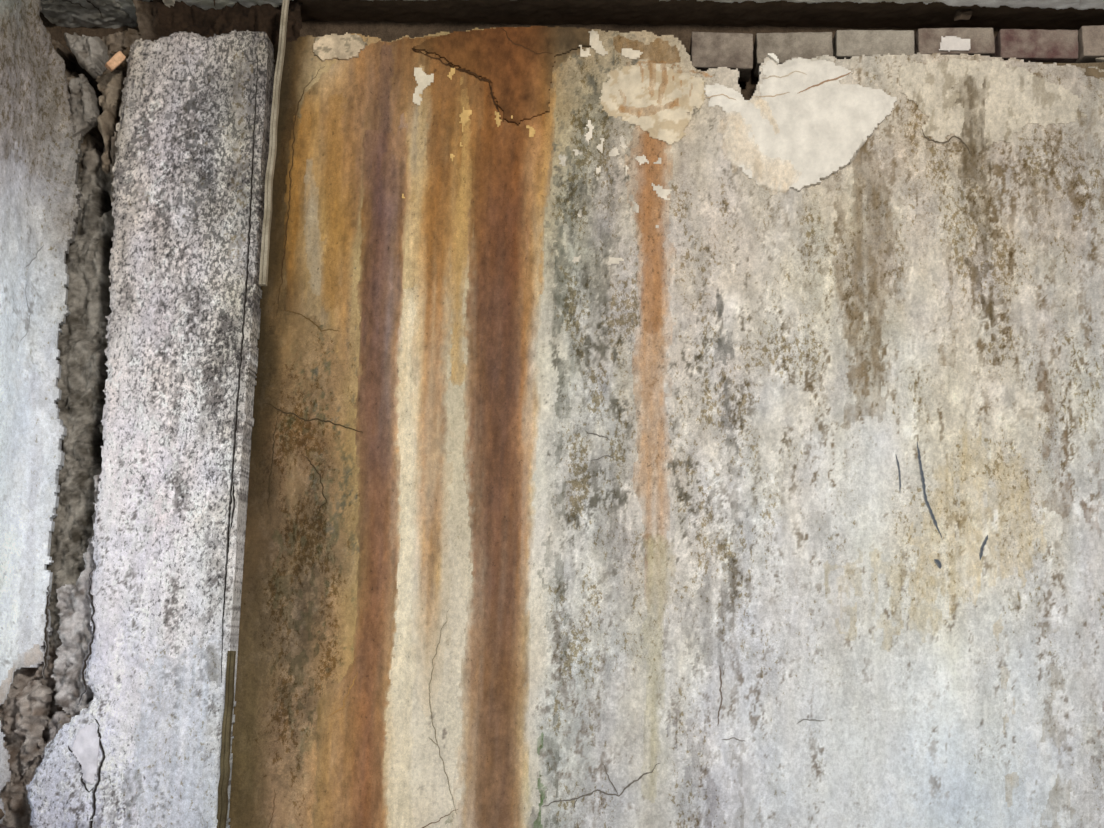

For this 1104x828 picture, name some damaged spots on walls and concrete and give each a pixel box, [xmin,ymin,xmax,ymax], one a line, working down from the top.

flaking render [0,644,43,703]
crack [0,0,140,828]
flaking render [71,723,100,784]
spalling [105,51,126,72]
rust [282,36,589,828]
leakage [525,476,573,828]
flaking render [579,30,608,57]
rust [624,124,677,803]
flaking render [599,36,1087,195]
leakage [832,139,898,430]
leakage [823,356,1104,652]
leakage [938,74,1008,371]